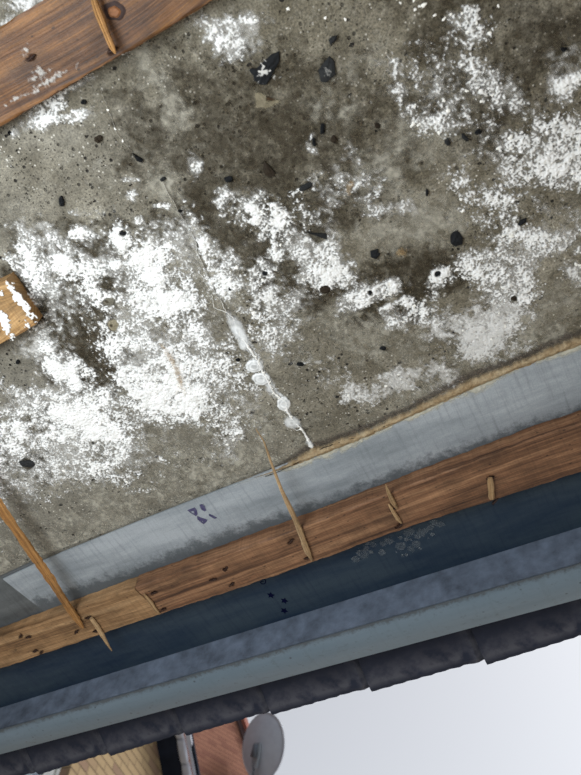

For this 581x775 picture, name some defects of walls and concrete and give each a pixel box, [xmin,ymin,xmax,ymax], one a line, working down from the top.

crack [163,184,234,320]
leakage [0,0,581,556]
crack [242,339,354,477]